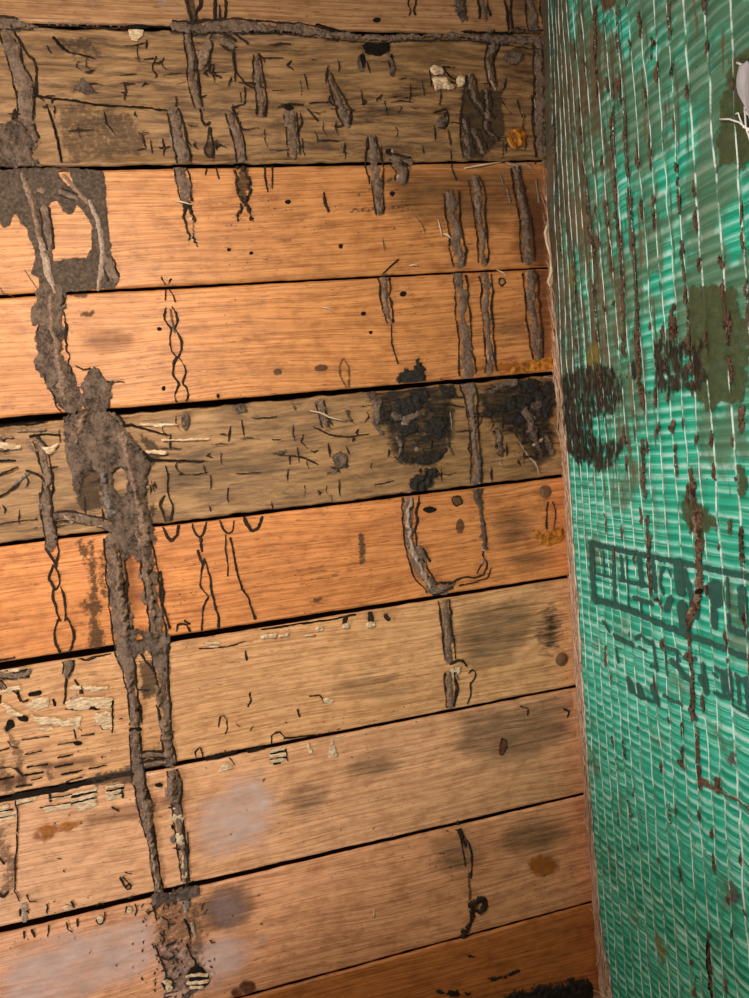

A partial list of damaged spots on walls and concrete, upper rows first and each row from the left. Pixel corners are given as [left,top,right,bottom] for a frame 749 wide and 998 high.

water stain [367,358,458,466]
water stain [474,347,636,476]
water stain [647,338,708,395]
peeling [0,657,125,832]
water stain [436,989,471,997]
water stain [505,977,594,998]